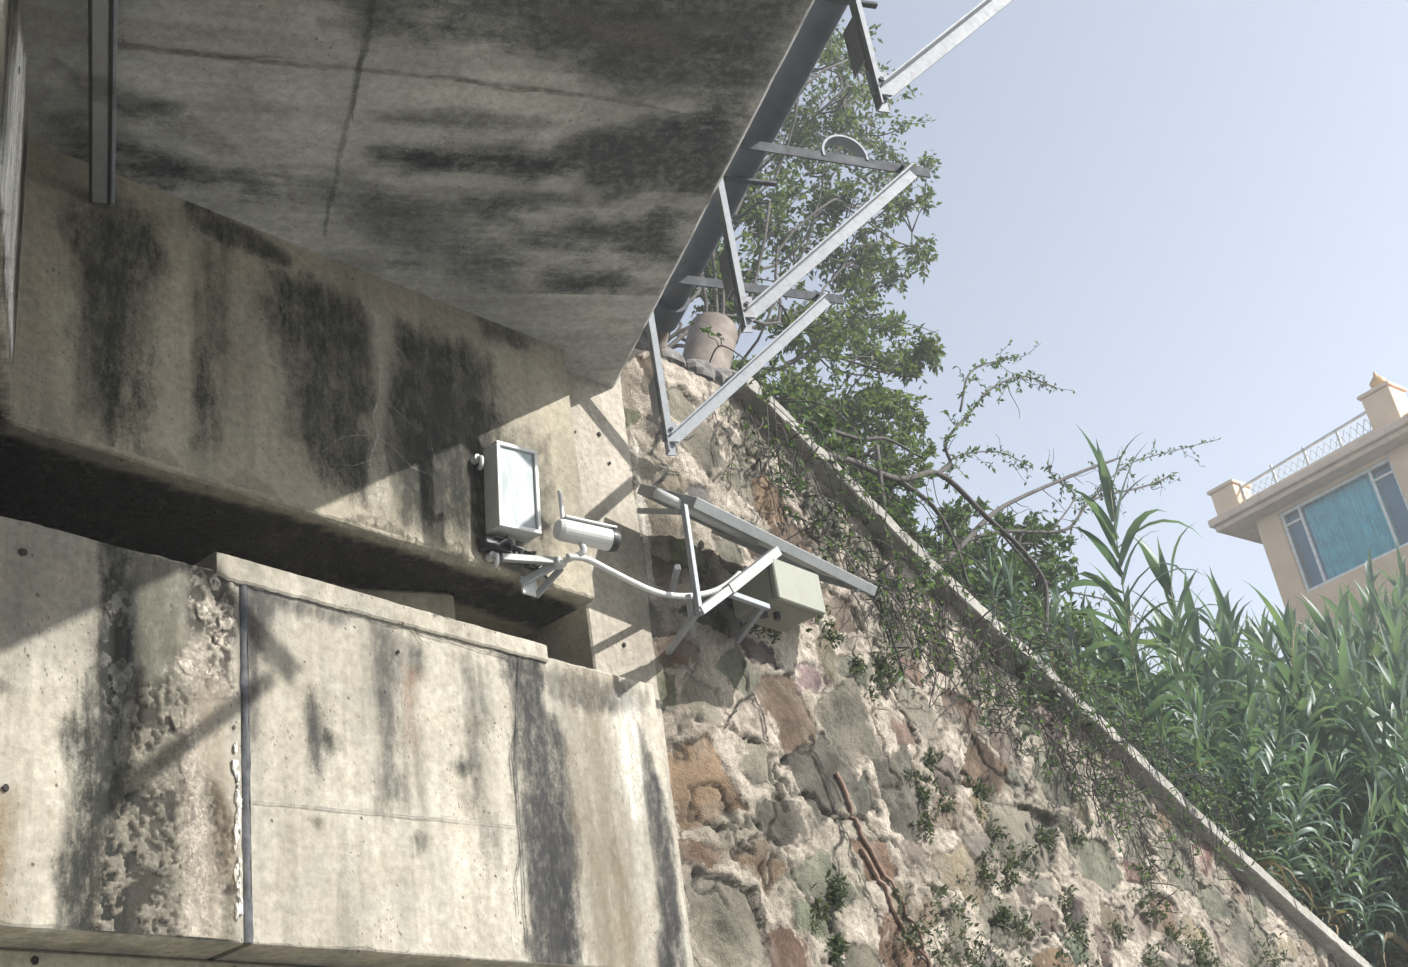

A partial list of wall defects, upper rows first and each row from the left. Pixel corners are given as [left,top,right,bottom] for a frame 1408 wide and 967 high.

water stain [0,0,27,367]
water stain [61,202,166,432]
water stain [116,142,268,194]
water stain [185,201,499,519]
water stain [377,0,802,199]
water stain [524,214,676,261]
spalling [91,565,243,941]
water stain [0,390,576,933]
water stain [498,651,583,965]
water stain [615,694,681,967]